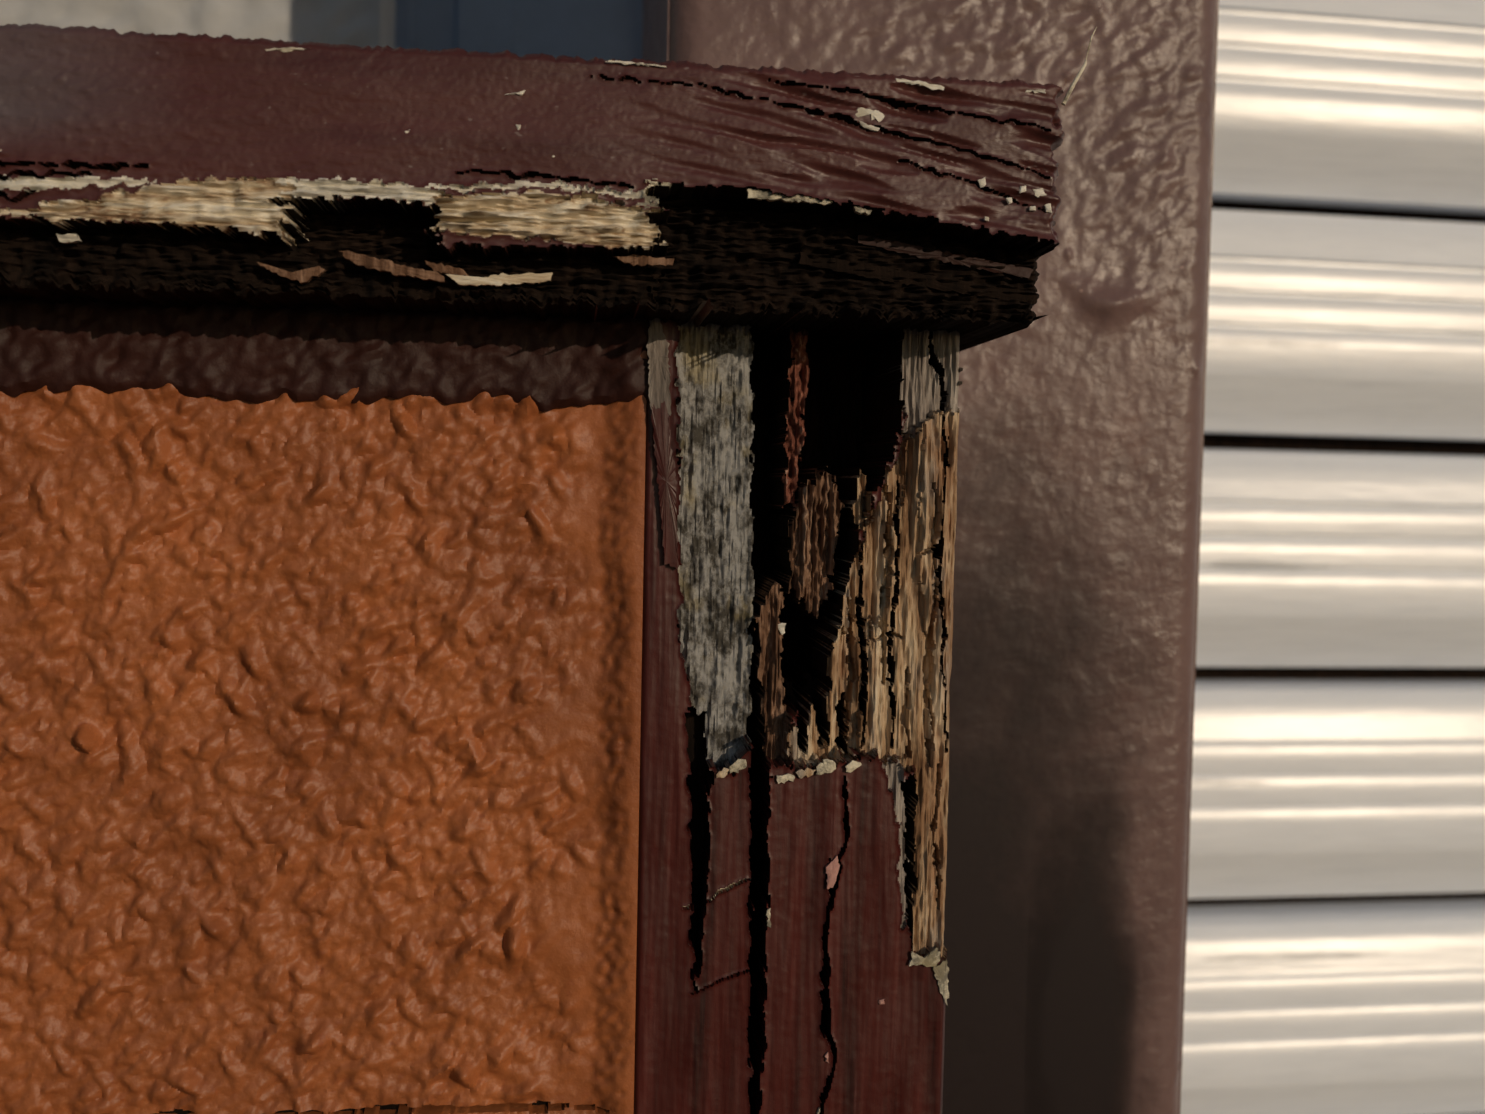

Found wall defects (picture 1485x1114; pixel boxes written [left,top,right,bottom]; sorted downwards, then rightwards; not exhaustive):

peeling [605,60,667,68]
peeling [895,78,945,91]
peeling [855,107,885,132]
spalling [0,149,1060,784]
crack [683,339,782,1114]
peeling [908,947,949,1005]